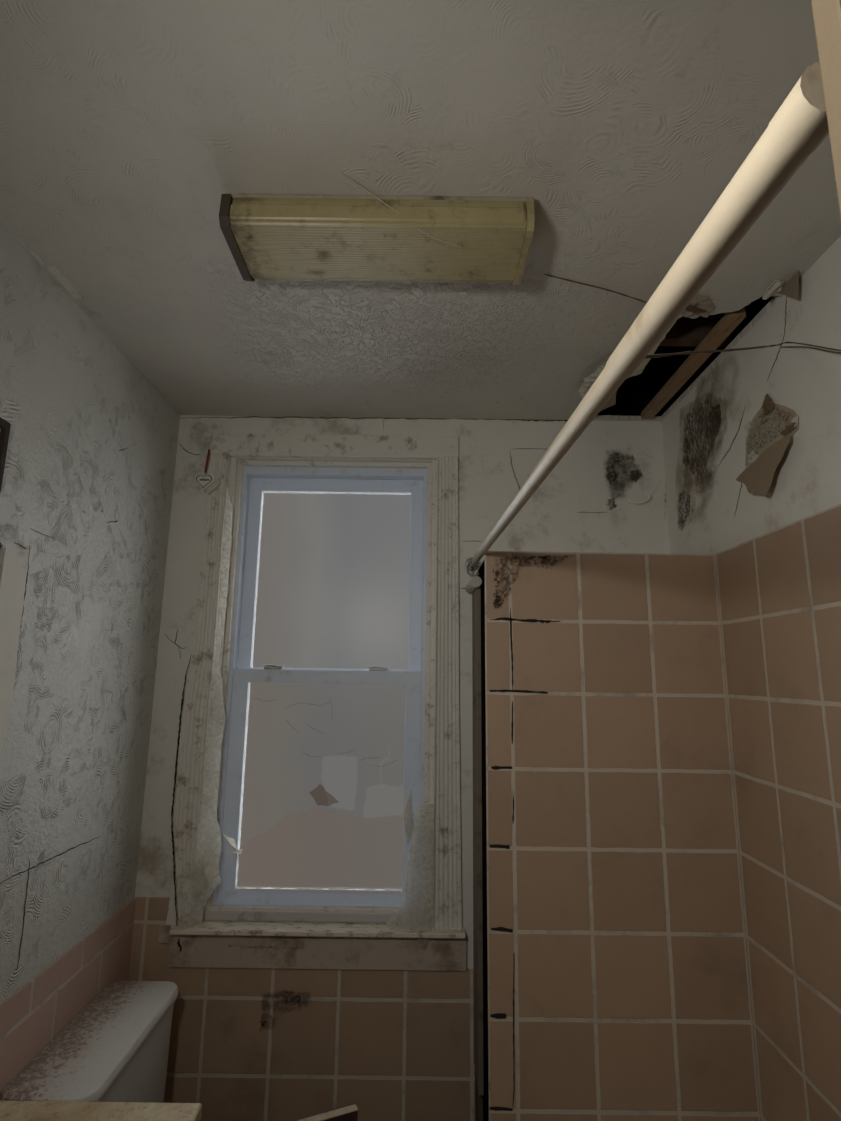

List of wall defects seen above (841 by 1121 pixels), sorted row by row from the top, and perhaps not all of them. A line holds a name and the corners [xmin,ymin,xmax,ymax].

spalling [681,294,715,319]
mould [606,453,642,510]
leakage [683,368,722,482]
flaking render [718,270,799,517]
hole [0,545,29,756]
crack [166,630,192,952]
crack [0,836,100,969]